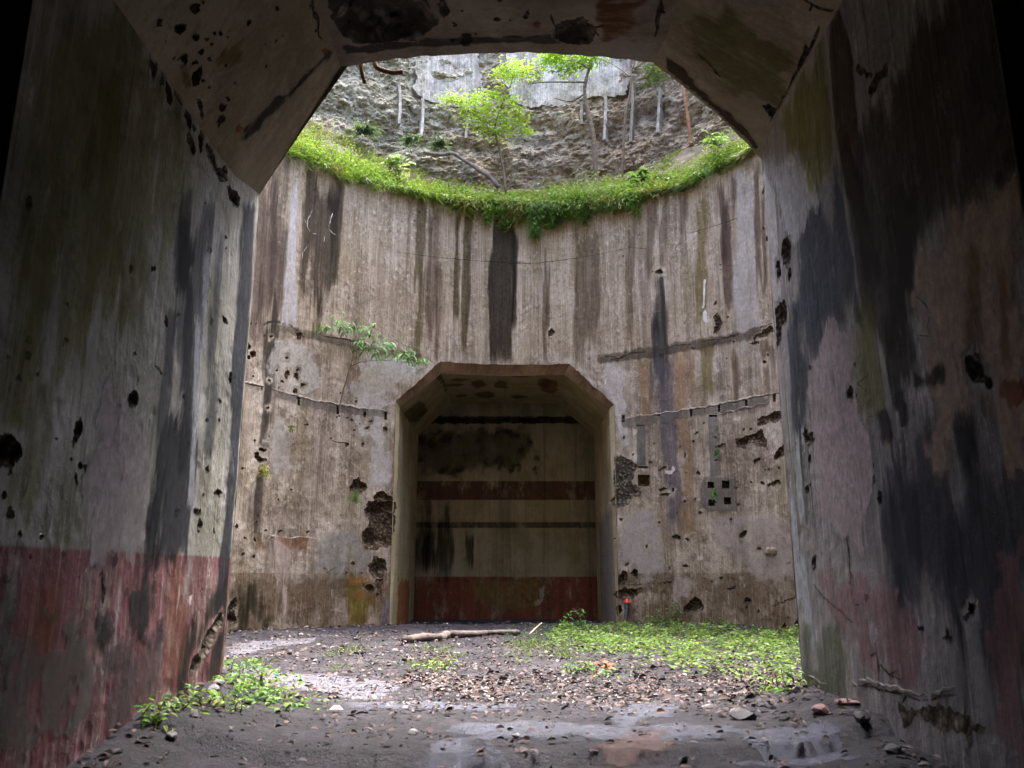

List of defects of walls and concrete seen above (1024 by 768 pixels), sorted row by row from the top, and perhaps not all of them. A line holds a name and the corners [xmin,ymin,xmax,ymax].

spalling [327,0,463,44]
spalling [550,16,597,45]
damp [489,223,517,356]
spalling [712,411,784,489]
spalling [609,453,667,526]
spalling [345,477,397,597]
spalling [189,597,238,676]
spalling [897,700,987,748]